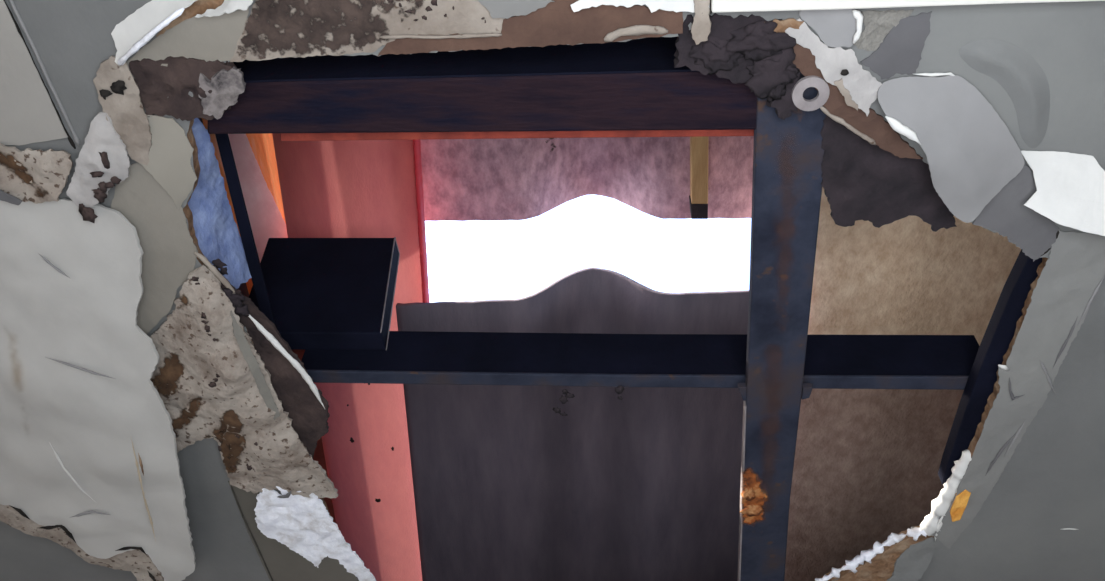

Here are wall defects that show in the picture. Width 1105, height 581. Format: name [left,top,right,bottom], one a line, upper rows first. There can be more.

flaking render [230,0,555,62]
peeling [571,0,694,13]
peeling [799,9,914,51]
damp [0,152,48,198]
peeling [228,134,288,263]
peeling [877,72,1105,257]
damp [151,354,184,397]
damp [172,398,202,437]
damp [207,409,258,473]
flaking render [254,486,376,581]
rust [740,468,767,524]
spalling [815,449,972,581]